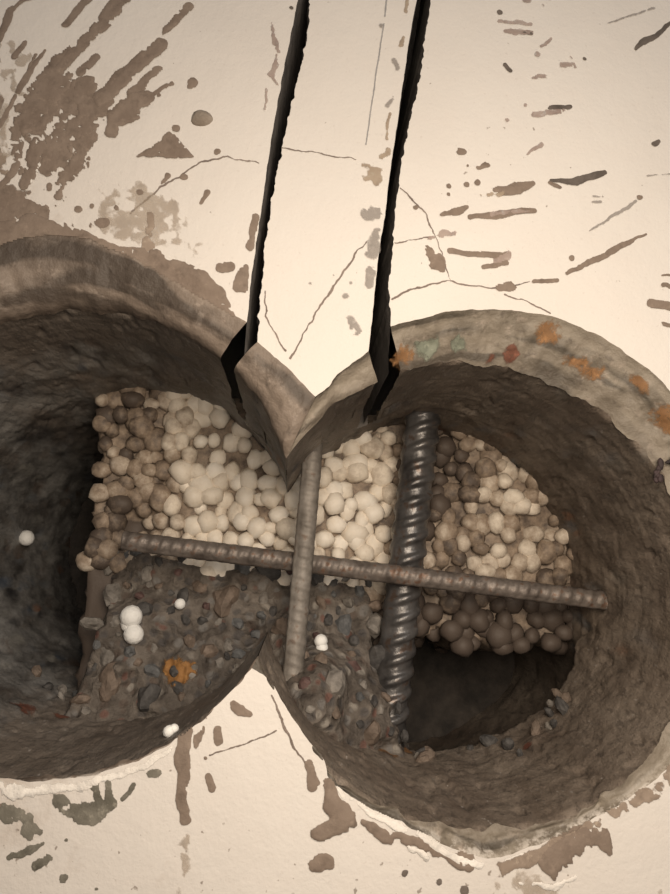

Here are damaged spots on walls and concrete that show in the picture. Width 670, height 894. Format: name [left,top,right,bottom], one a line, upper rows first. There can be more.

damp [0,49,46,128]
damp [53,0,130,76]
damp [93,2,194,107]
crack [282,147,356,160]
crack [264,241,367,359]
corrosion [393,344,414,365]
corrosion [488,344,520,363]
corrosion [536,322,561,344]
spalling [64,411,608,758]
spalling [0,746,172,801]
spalling [337,786,484,869]
damp [497,764,670,894]